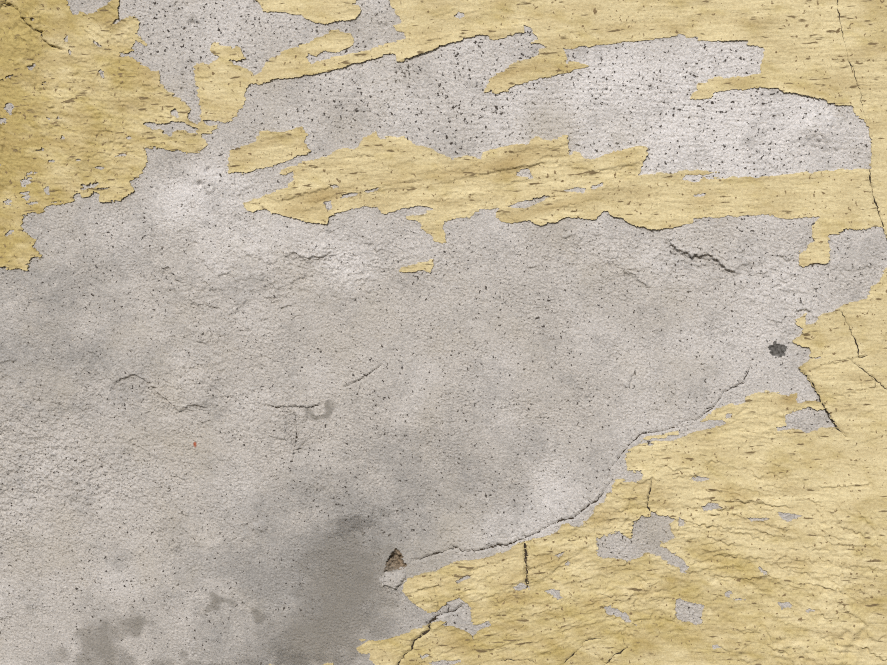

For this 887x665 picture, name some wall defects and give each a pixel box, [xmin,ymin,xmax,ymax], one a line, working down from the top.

peeling [113,0,406,125]
peeling [253,24,525,85]
crack [837,0,864,112]
peeling [227,126,311,173]
peeling [243,131,883,267]
crack [869,169,887,240]
crack [842,312,886,389]
spalling [110,378,180,414]
crack [799,370,841,432]
peeling [799,359,887,437]
crack [416,367,750,587]
peeling [402,541,527,613]